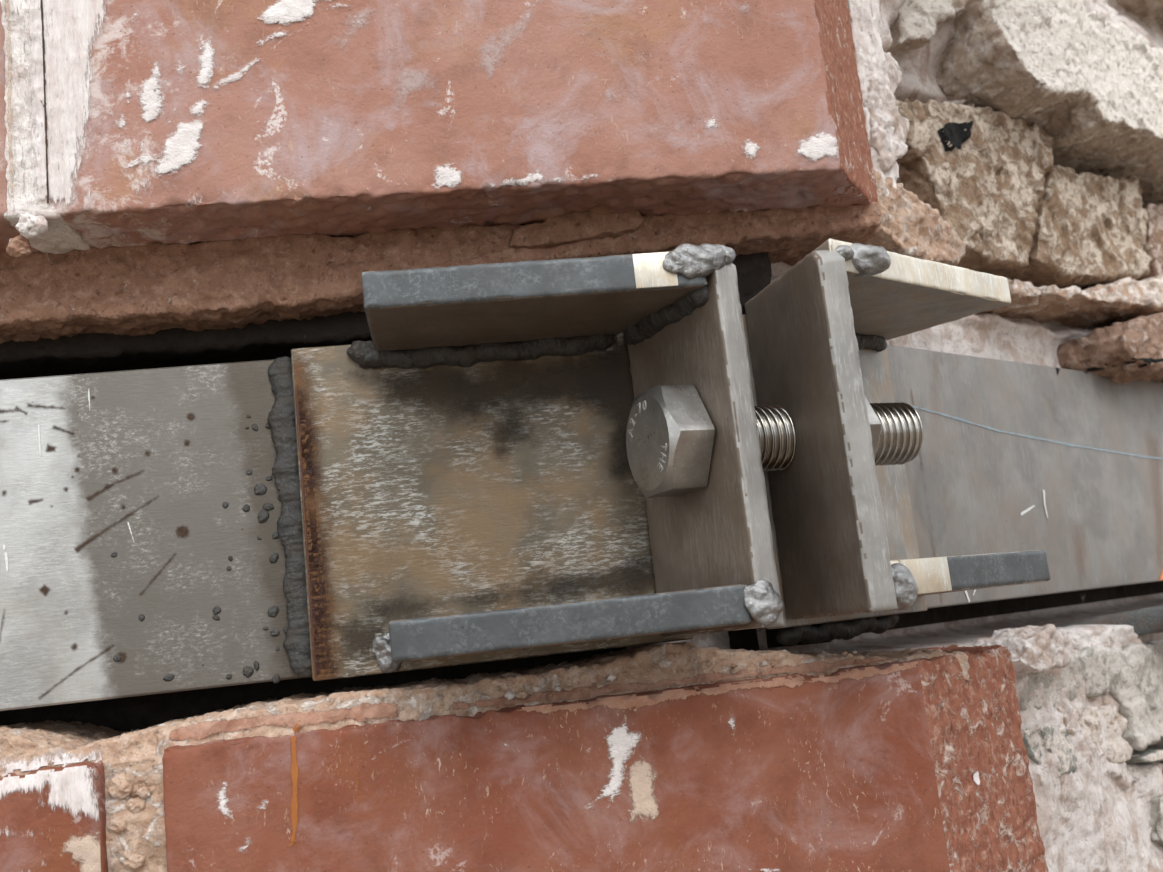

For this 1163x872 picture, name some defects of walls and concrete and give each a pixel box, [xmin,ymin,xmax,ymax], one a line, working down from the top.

peeling [111,42,259,127]
peeling [122,141,162,193]
corrosion [289,721,300,846]
peeling [628,761,658,821]
peeling [63,832,119,872]